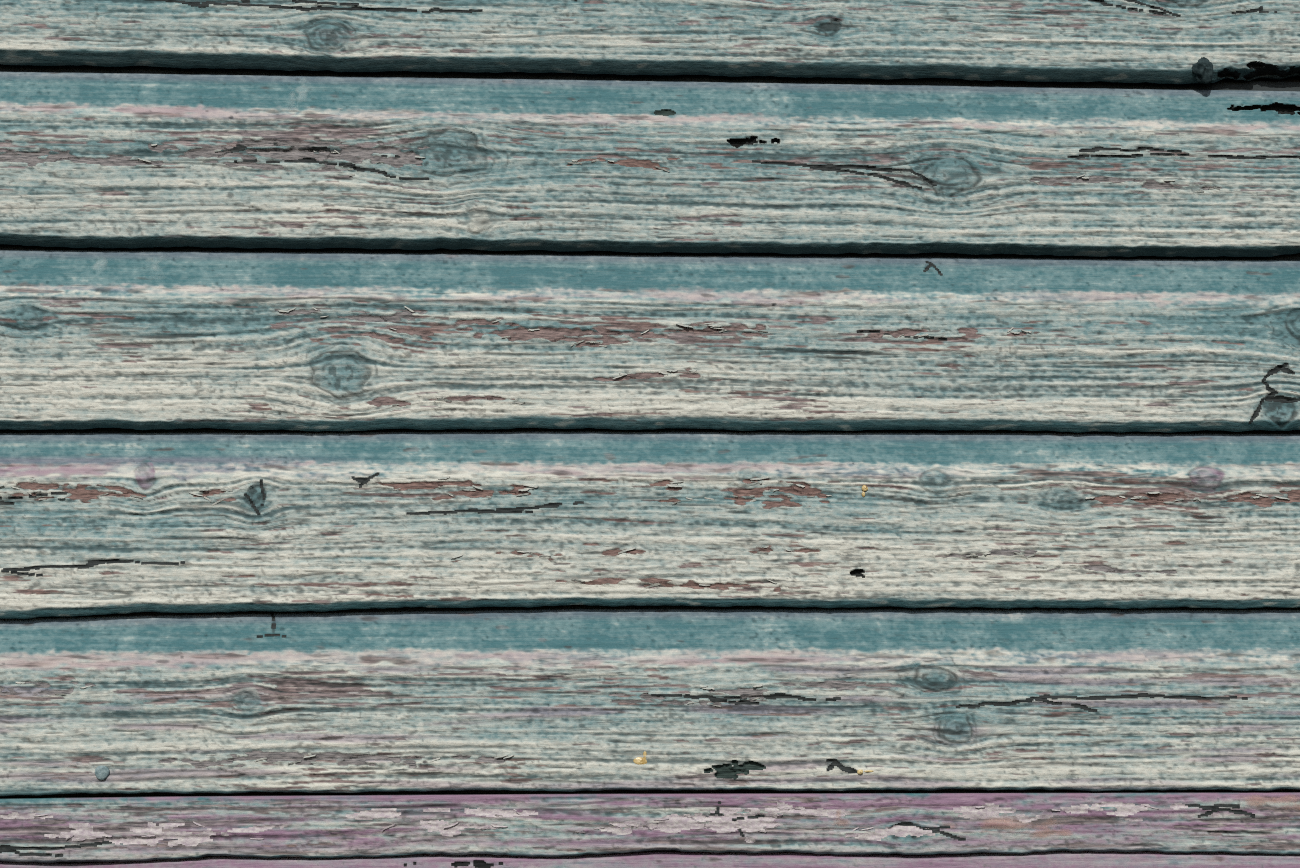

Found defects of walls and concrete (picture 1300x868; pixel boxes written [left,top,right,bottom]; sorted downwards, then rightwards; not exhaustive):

crack [155,0,483,13]
crack [1088,0,1181,17]
crack [752,160,937,189]
peeling [455,317,767,347]
crack [1248,363,1300,424]
peeling [377,476,539,500]
peeling [650,476,832,509]
crack [1,559,185,576]
crack [643,693,841,704]
spalling [704,760,766,780]
peeling [0,812,288,847]
peeling [573,802,935,843]